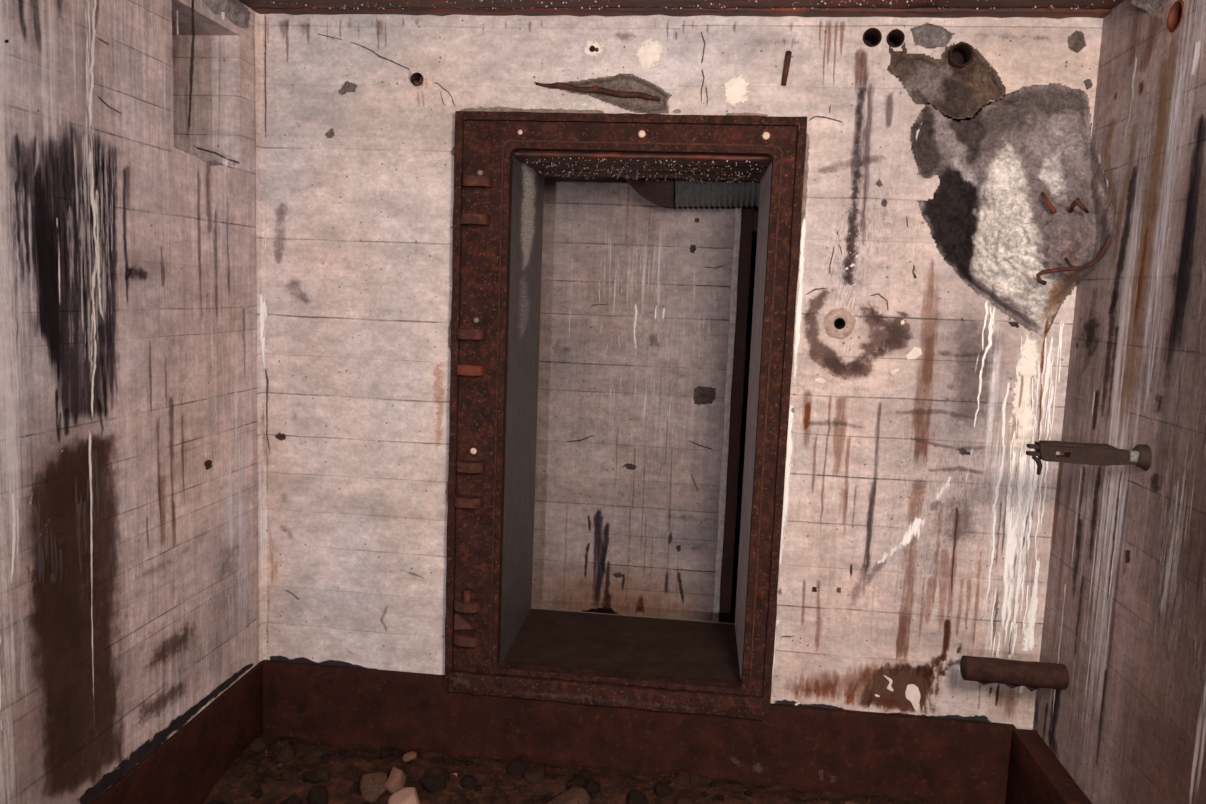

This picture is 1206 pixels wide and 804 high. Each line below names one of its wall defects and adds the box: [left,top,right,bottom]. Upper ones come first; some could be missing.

spalling [534,73,681,114]
water stain [844,170,860,284]
spalling [887,22,1117,336]
water stain [3,0,147,696]
water stain [806,288,908,375]
peeling [890,347,922,375]
water stain [974,300,995,427]
water stain [1134,0,1206,651]
rust [847,620,950,712]
water stain [1197,684,1206,781]